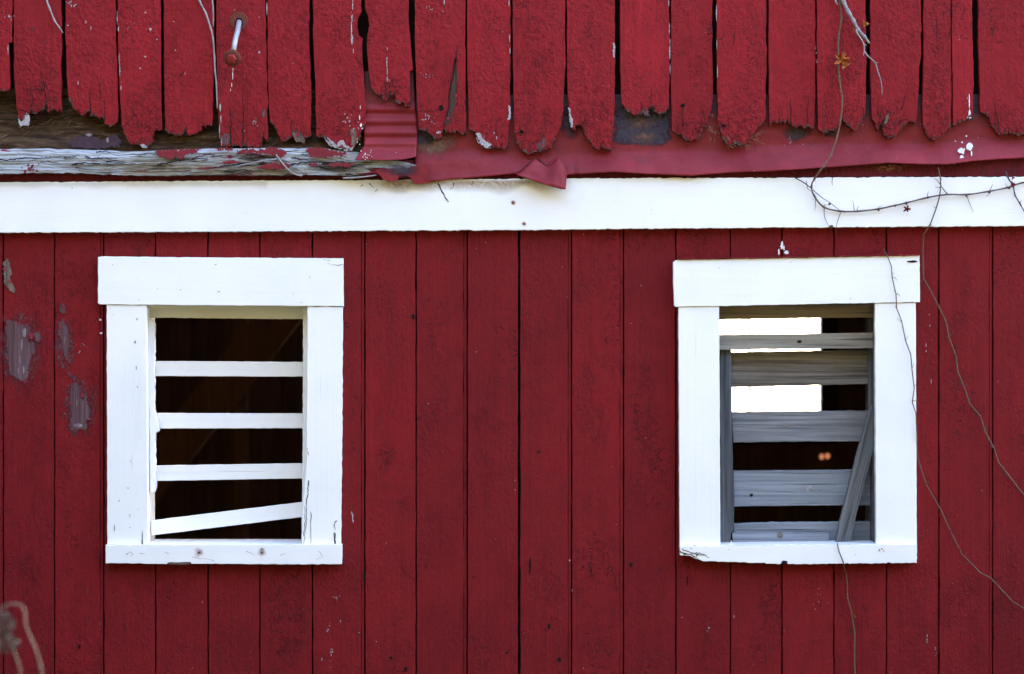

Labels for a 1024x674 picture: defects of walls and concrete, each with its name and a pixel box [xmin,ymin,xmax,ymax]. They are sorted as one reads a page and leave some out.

peeling [2,259,16,293]
peeling [2,314,42,383]
peeling [55,303,93,434]